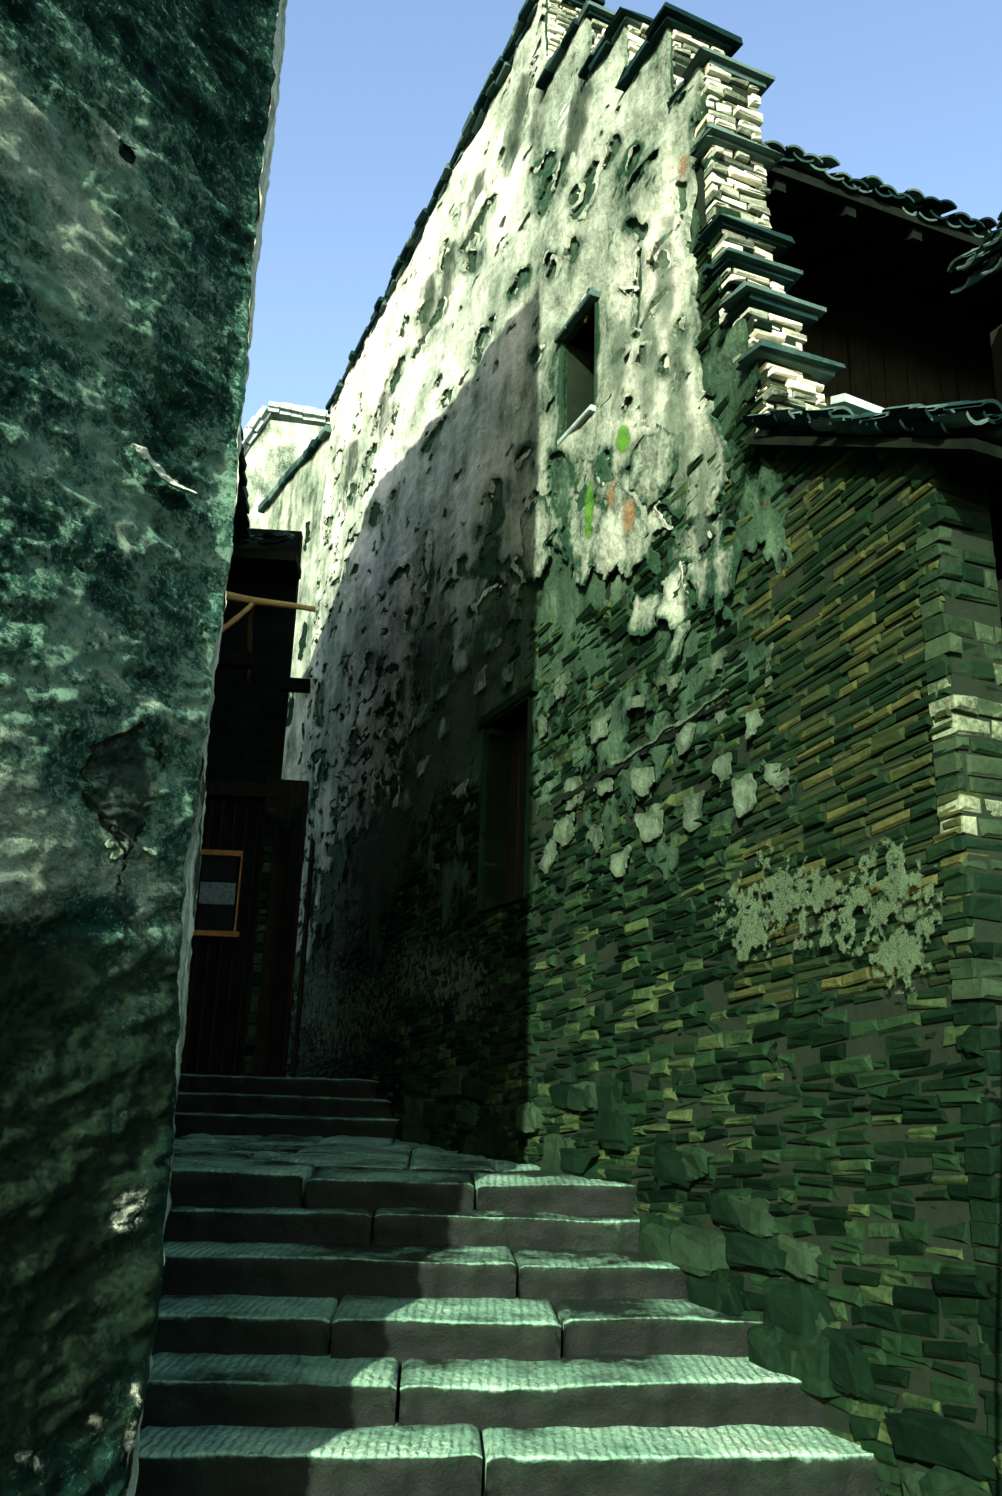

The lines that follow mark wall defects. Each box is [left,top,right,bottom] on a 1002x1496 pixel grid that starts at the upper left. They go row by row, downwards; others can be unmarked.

flaking render [435,194,498,274]
flaking render [510,134,641,298]
flaking render [670,179,687,217]
flaking render [619,219,677,365]
flaking render [303,296,448,552]
flaking render [298,599,323,661]
peeling [452,423,733,744]
flaking render [80,721,163,859]
peeling [538,767,664,877]
peeling [675,723,696,756]
peeling [683,752,791,832]
peeling [745,709,763,740]